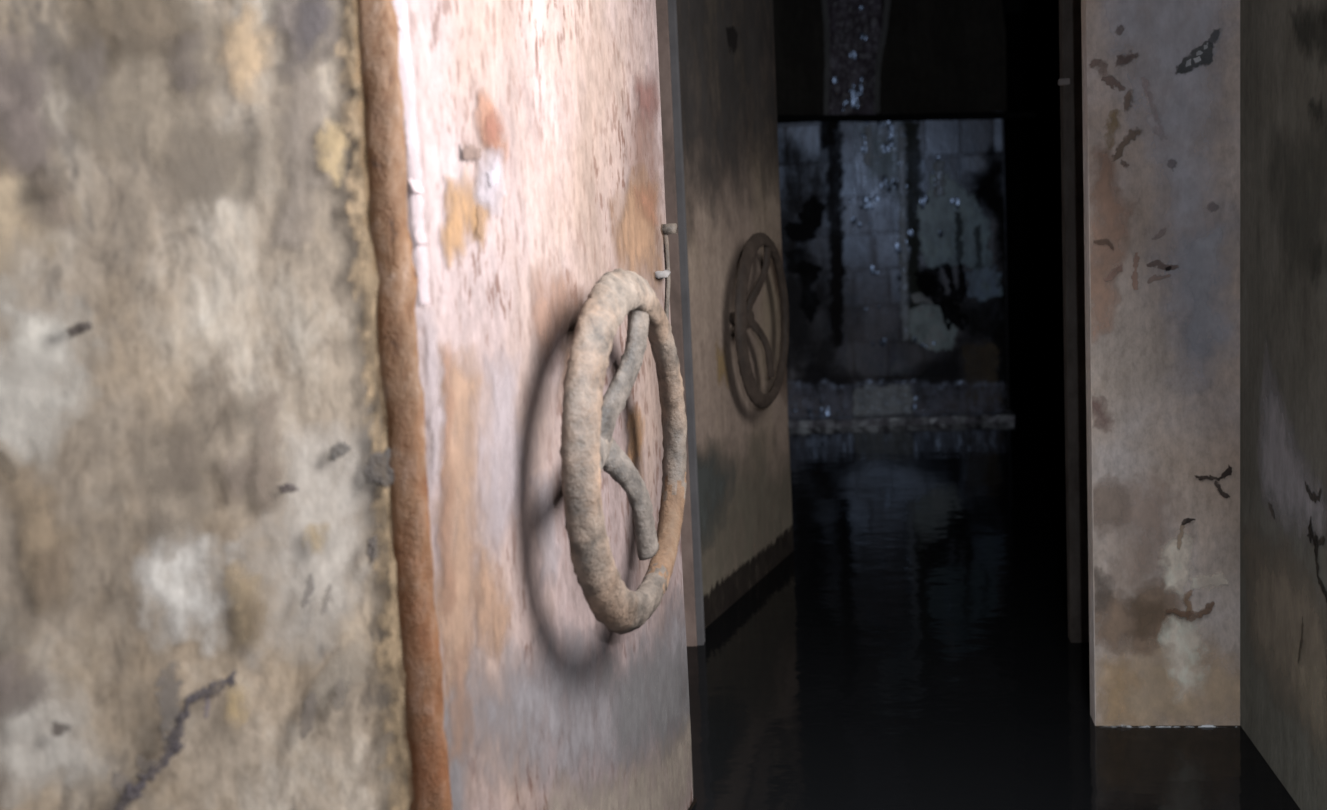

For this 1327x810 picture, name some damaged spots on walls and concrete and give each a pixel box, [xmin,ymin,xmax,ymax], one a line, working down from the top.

peeling [1176,29,1219,74]
damp [781,0,1008,417]
crack [1177,518,1196,549]
crack [1195,466,1232,498]
crack [1298,482,1327,662]
crack [108,662,236,810]